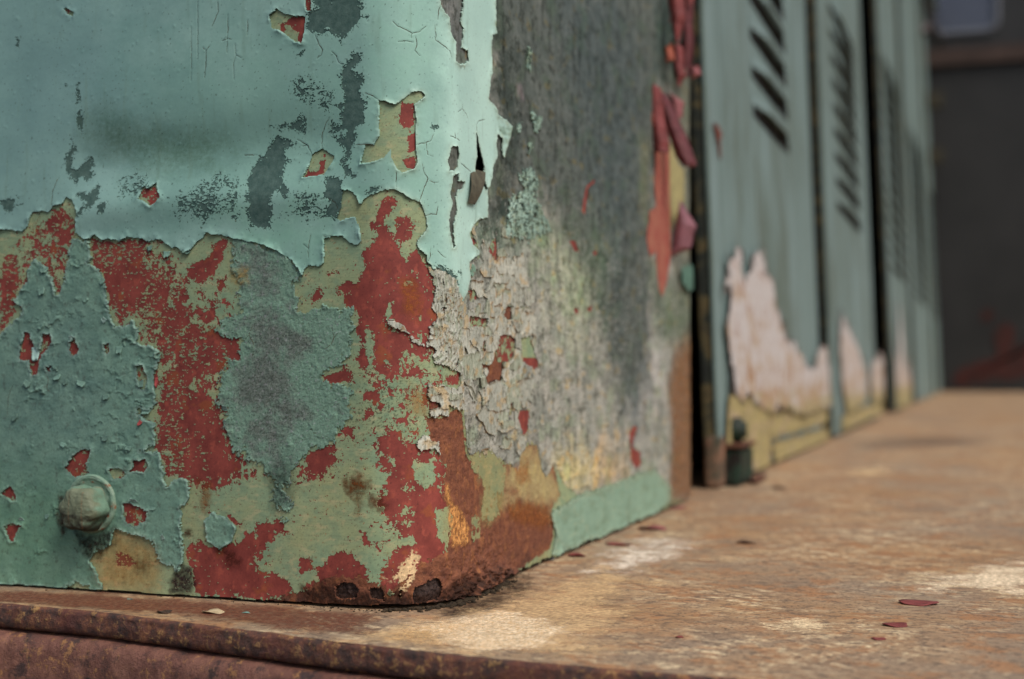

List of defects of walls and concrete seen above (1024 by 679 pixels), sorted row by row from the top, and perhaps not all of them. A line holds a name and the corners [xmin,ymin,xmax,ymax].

crack [396,3,450,52]
crack [416,104,484,216]
peeling [0,0,701,614]
peeling [723,242,912,420]
rust [0,402,561,633]